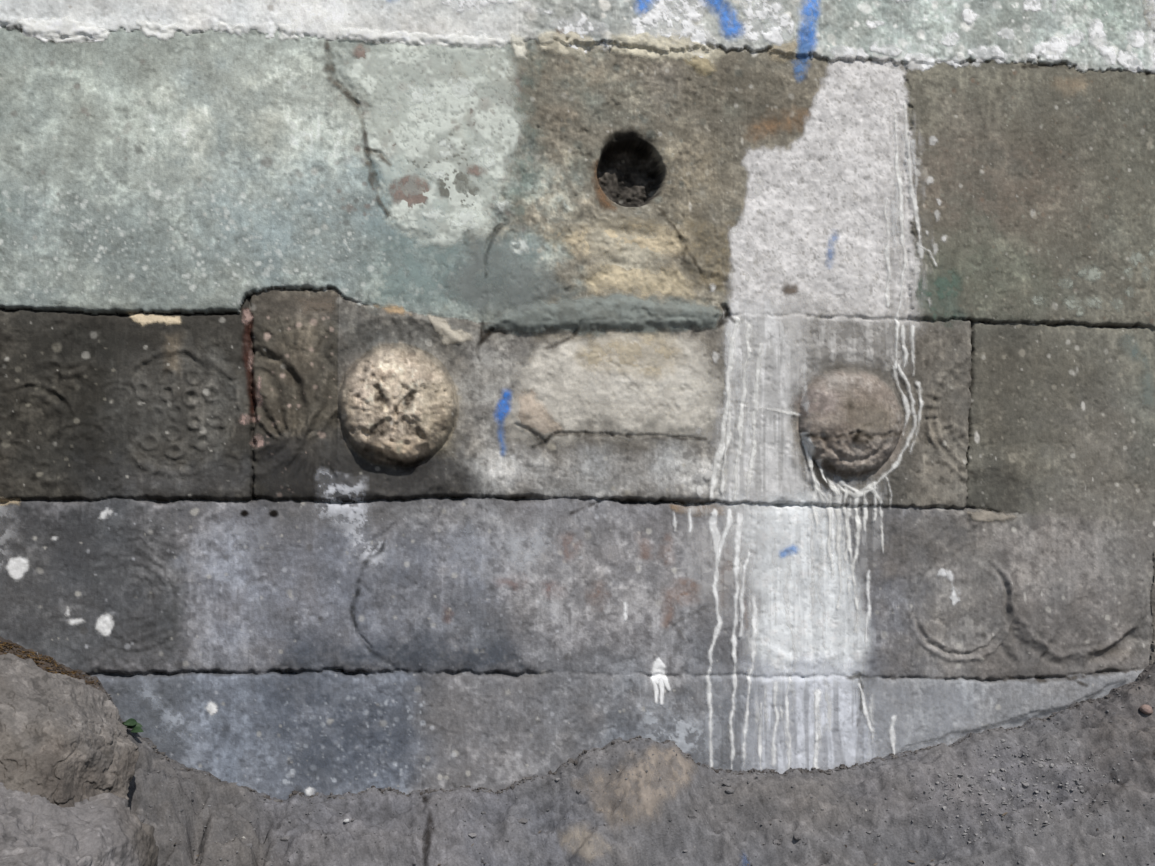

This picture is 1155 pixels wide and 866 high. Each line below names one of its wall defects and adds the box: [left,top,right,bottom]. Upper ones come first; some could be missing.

crack [325,41,390,213]
damp [645,317,799,769]
damp [813,690,831,769]
damp [859,684,873,738]